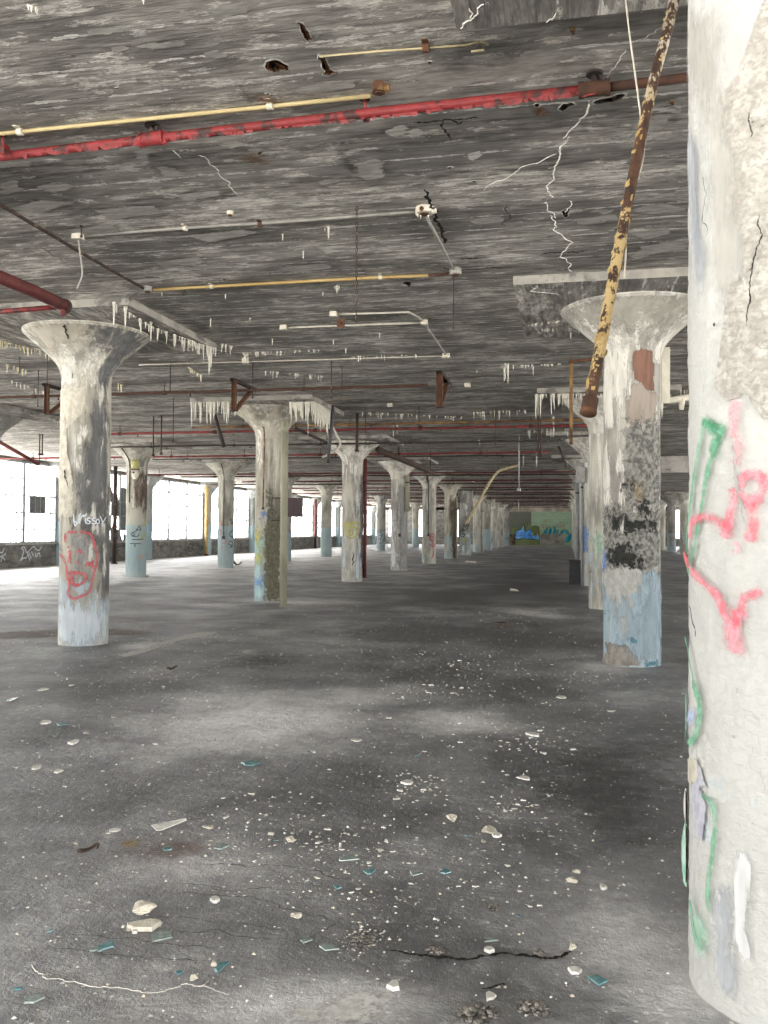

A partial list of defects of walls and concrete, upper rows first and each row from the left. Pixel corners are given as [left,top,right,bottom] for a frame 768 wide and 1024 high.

spalling [263,57,292,74]
peeling [289,20,356,94]
crack [412,117,478,139]
peeling [318,159,385,186]
crack [484,101,590,271]
crack [423,189,512,271]
crack [746,216,763,323]
peeling [625,348,658,425]
peeling [602,566,642,667]
crack [32,863,347,994]
crack [384,924,571,961]